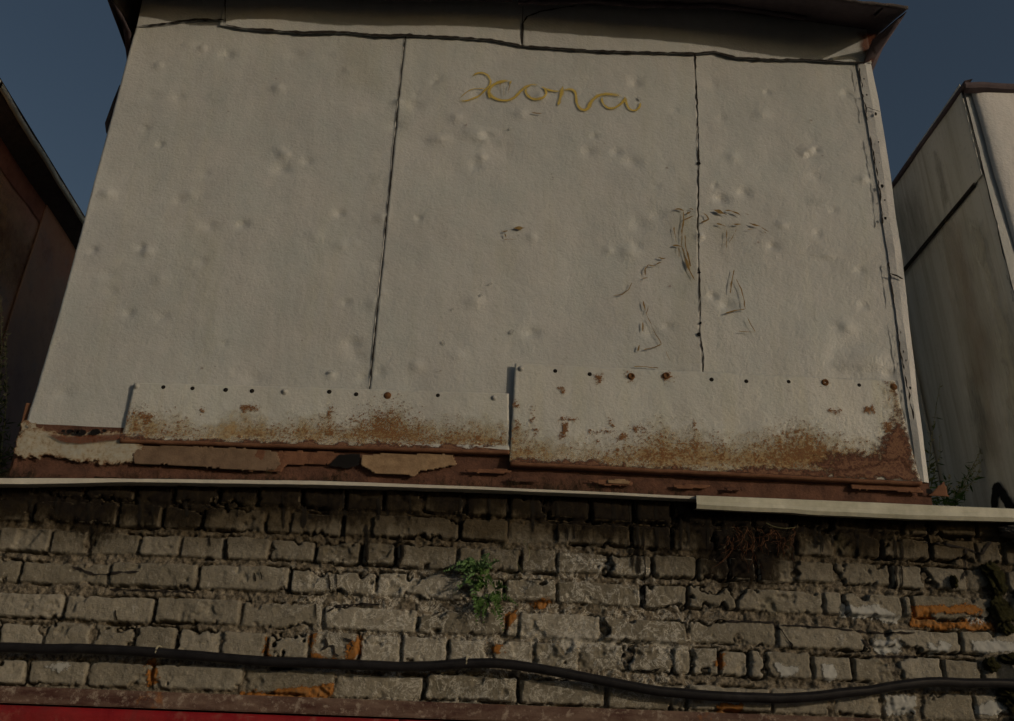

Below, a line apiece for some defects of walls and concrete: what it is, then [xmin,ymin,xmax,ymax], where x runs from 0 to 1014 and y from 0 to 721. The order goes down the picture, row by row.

peeling [14,420,145,467]
corrosion [49,380,922,481]
leakage [0,466,914,603]